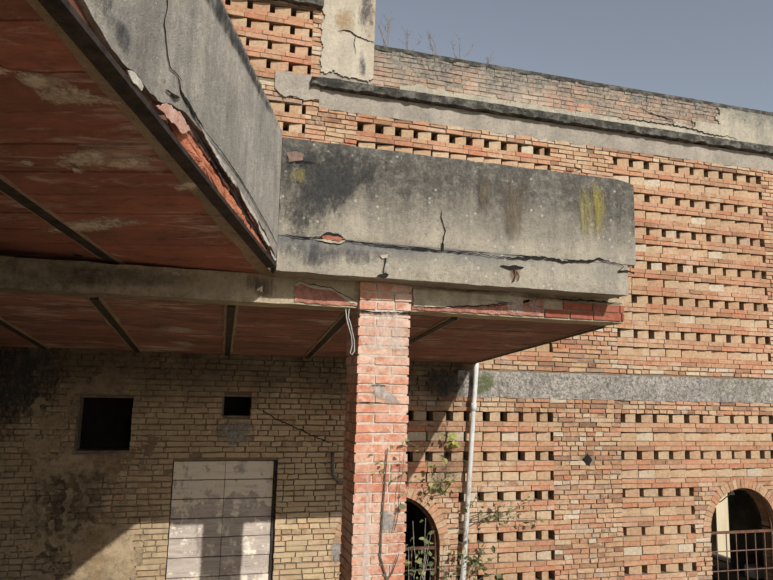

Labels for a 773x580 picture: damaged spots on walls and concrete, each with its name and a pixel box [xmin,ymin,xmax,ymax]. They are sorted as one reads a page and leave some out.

flaking render [127,70,144,91]
crack [164,0,323,243]
crack [617,107,734,138]
spalling [316,232,346,244]
crack [342,212,634,282]
flaking render [294,281,358,306]
flaking render [412,289,624,321]